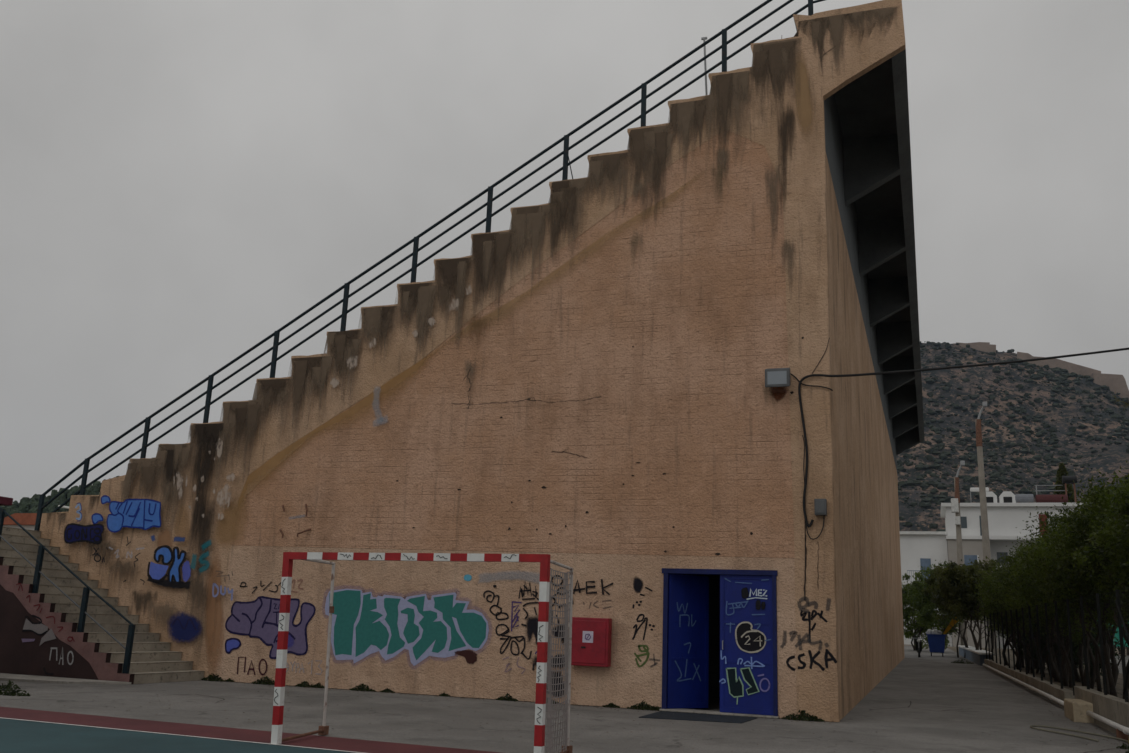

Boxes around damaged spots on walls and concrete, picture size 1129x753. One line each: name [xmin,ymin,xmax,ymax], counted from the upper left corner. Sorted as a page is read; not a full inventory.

leakage [121,7,896,661]
crack [452,368,601,409]